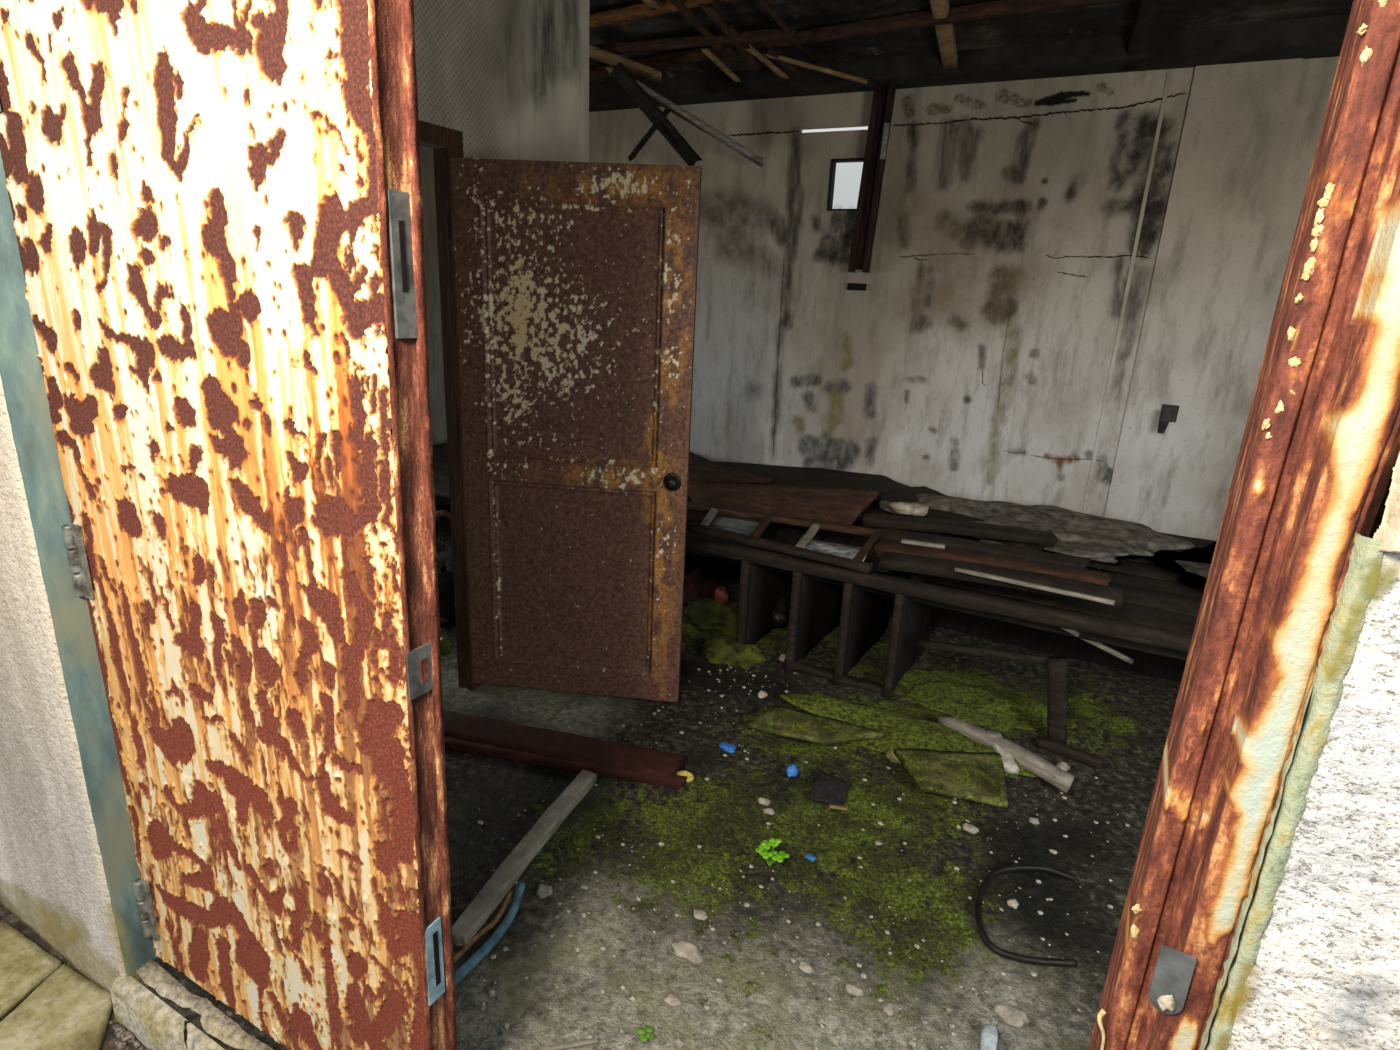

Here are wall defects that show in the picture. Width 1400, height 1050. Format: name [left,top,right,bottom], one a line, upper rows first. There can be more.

water stain [771,138,856,290]
water stain [937,179,1047,249]
water stain [1110,113,1172,276]
water stain [775,375,848,407]
water stain [800,436,872,470]
crack [183,1019,191,1049]